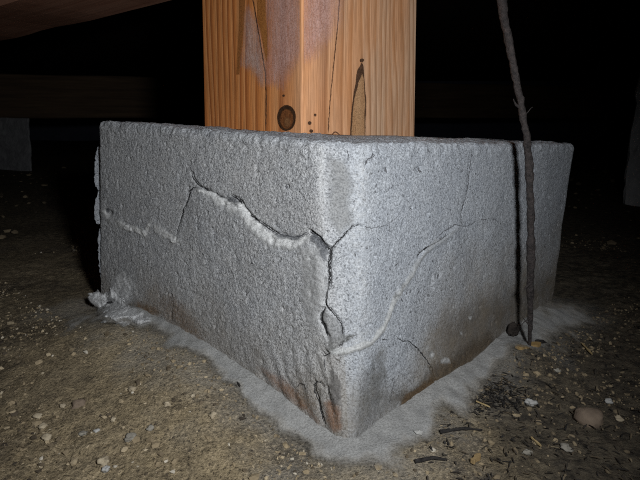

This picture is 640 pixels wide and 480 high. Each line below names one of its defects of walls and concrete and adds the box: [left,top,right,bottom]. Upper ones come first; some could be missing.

leakage [237,0,299,80]
crack [417,150,499,257]
crack [176,161,398,422]
crack [383,338,433,373]